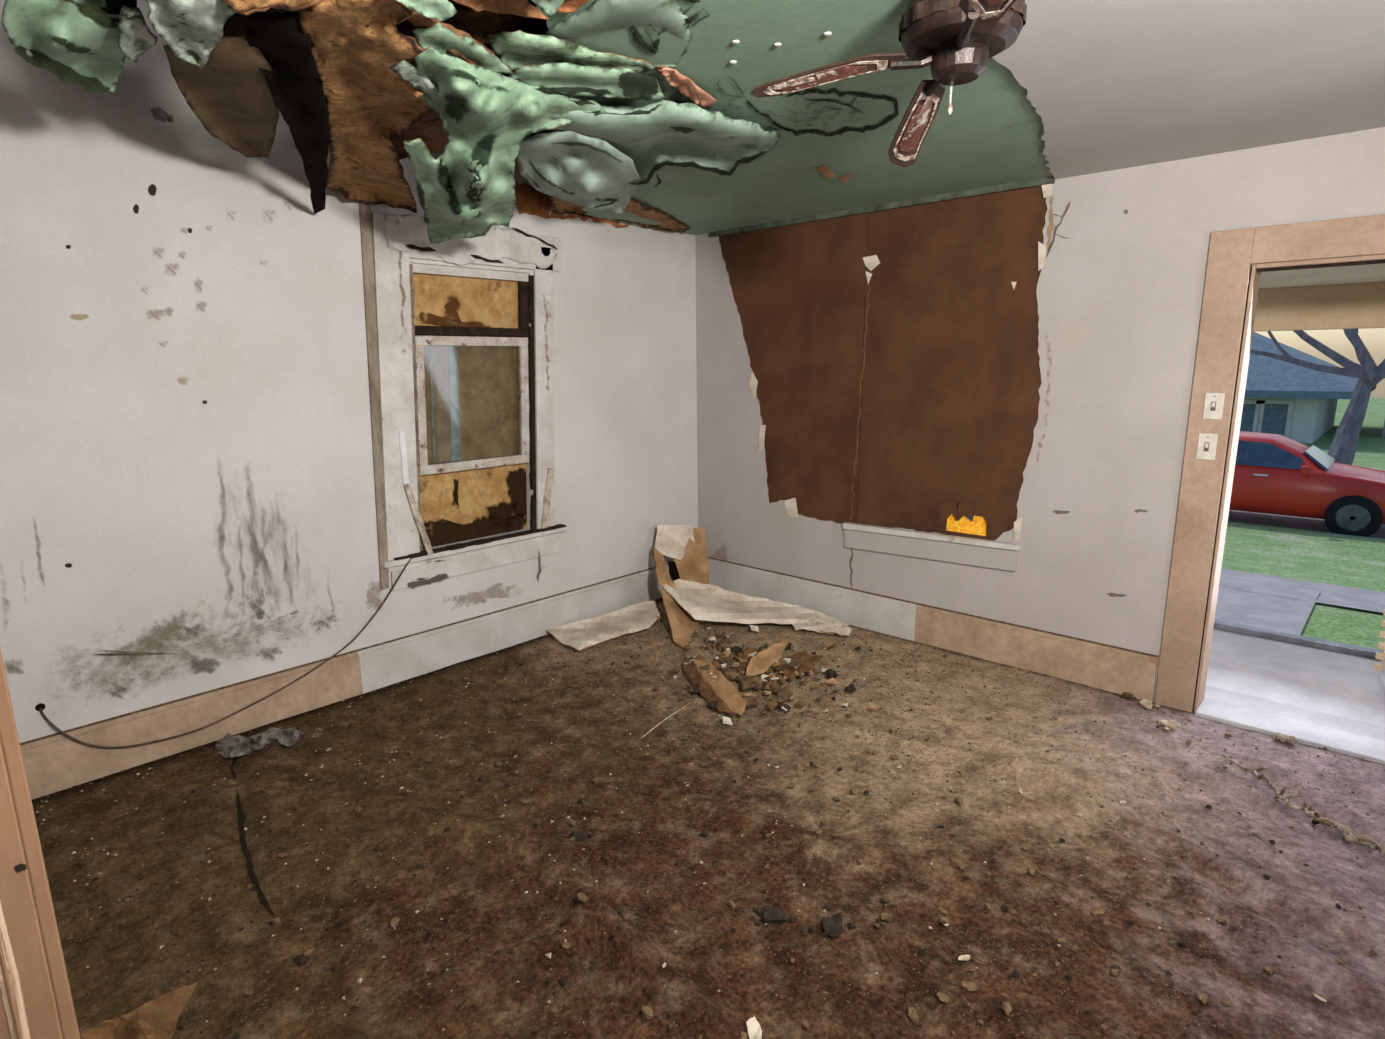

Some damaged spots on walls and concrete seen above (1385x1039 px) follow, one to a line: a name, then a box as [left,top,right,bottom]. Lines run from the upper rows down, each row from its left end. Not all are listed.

peeling [1,0,126,93]
peeling [150,106,174,122]
peeling [384,0,1053,541]
water stain [107,617,226,680]